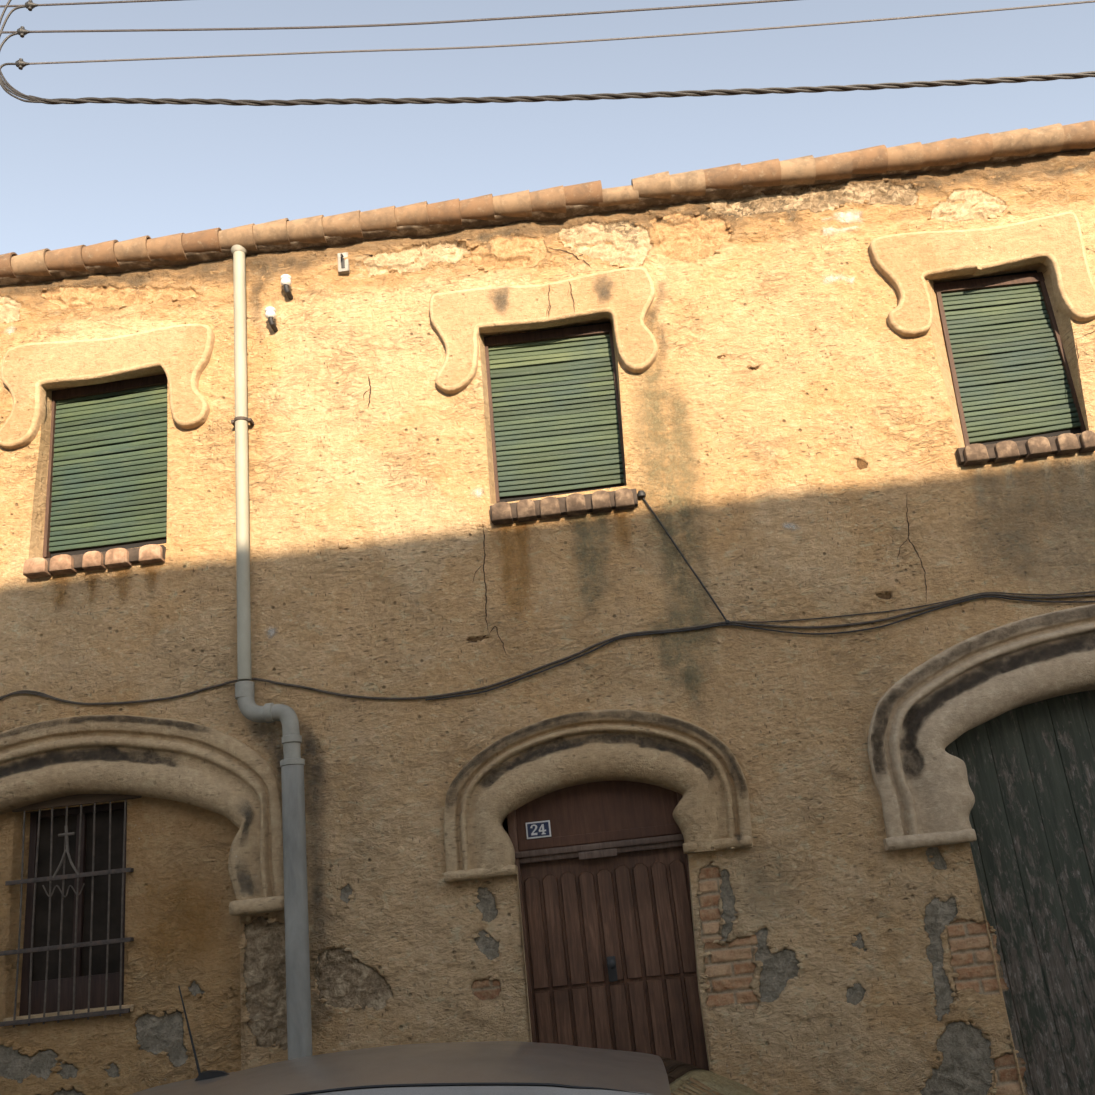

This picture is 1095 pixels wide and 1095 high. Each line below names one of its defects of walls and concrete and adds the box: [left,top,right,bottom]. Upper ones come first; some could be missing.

flaking render [363,235,547,277]
flaking render [558,178,918,268]
crack [467,524,506,653]
leakage [642,375,707,689]
crack [897,492,927,605]
flaking render [0,1042,85,1095]
flaking render [135,1007,192,1067]
flaking render [238,916,288,1050]
flaking render [312,948,393,1010]
flaking render [471,887,501,1000]
flaking render [916,896,1028,1095]